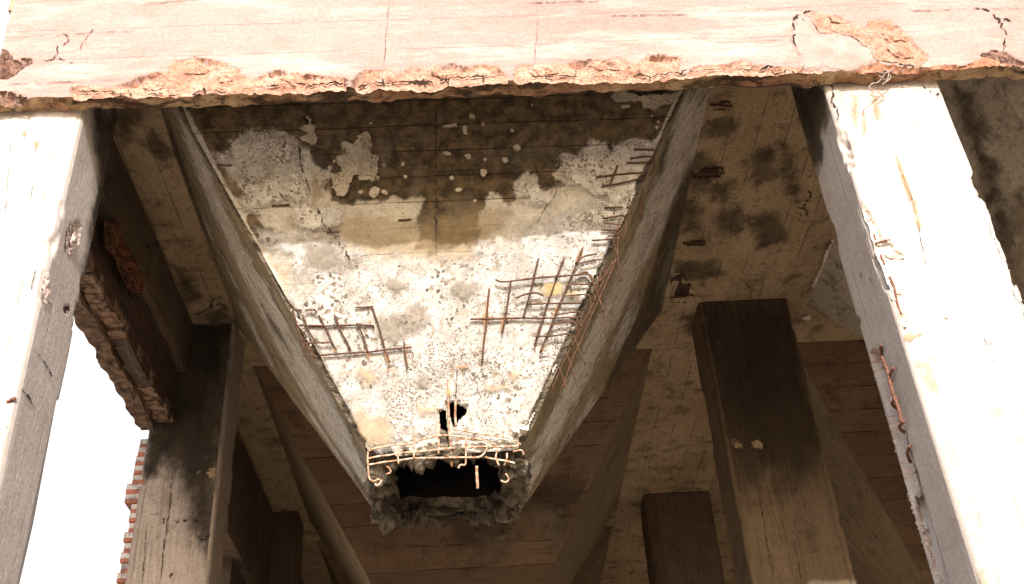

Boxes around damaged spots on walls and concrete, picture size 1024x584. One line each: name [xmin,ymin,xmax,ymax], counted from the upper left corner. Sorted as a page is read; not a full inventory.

spalling [0,49,33,108]
spalling [70,54,823,129]
spalling [807,11,1024,75]
crack [976,7,1020,51]
peeling [315,122,388,198]
crack [25,0,839,262]
water stain [954,87,1012,248]
water stain [717,209,786,248]
water stain [143,88,736,513]
corrosion [539,282,580,298]
corrosion [355,411,392,443]
spalling [365,380,535,467]